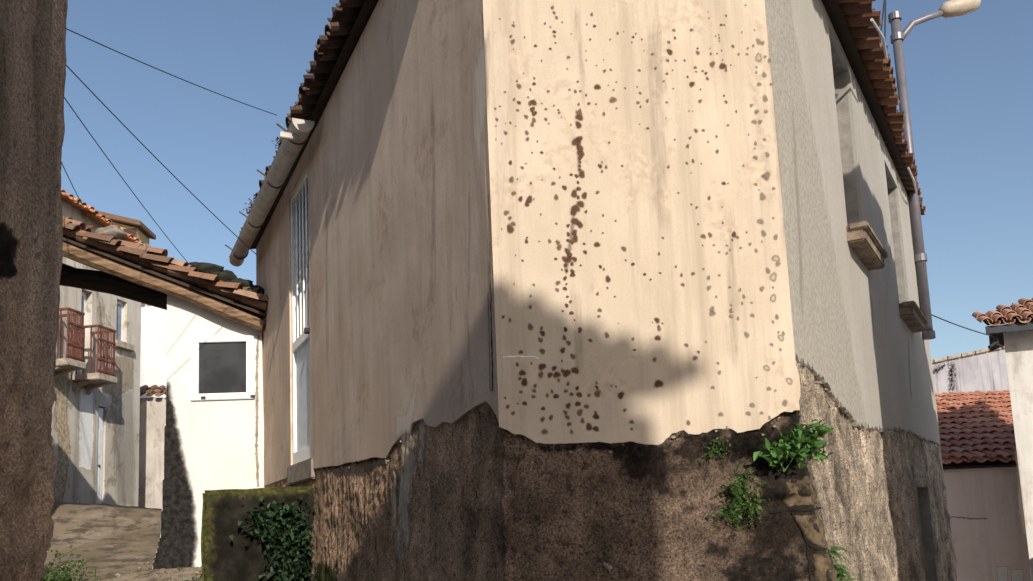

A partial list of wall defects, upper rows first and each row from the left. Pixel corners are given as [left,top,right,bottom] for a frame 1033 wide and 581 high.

damp [473,6,563,206]
damp [568,13,649,120]
damp [609,11,773,167]
damp [698,217,777,254]
damp [504,323,634,434]
peeling [527,417,780,453]
flaking render [782,475,837,581]